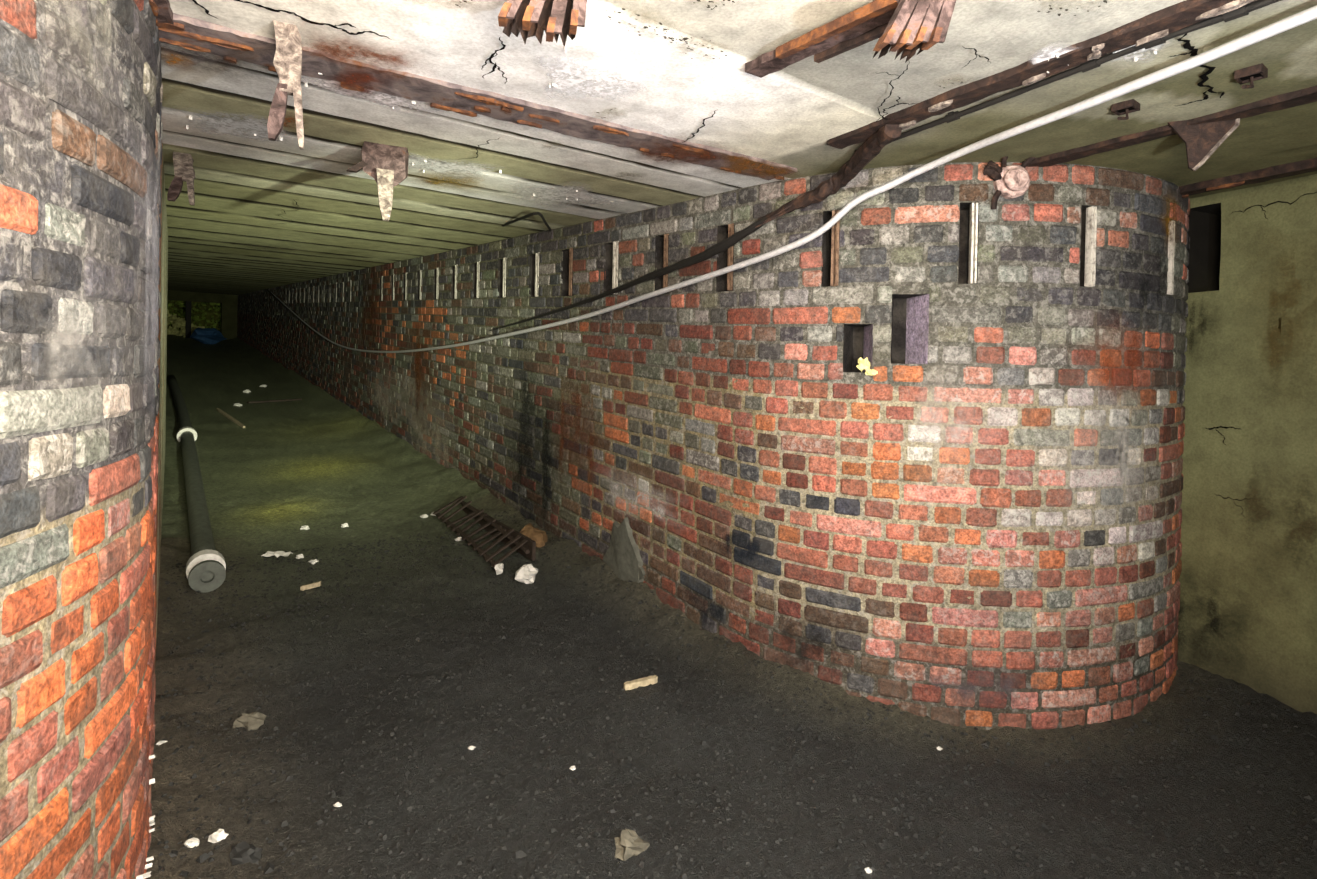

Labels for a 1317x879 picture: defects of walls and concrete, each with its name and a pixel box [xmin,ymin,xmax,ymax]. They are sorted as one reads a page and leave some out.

crack [481,37,507,83]
crack [1170,34,1225,106]
crack [868,60,917,123]
corrosion [430,92,560,129]
corrosion [593,125,629,137]
corrosion [640,144,789,180]
crack [1232,192,1317,218]